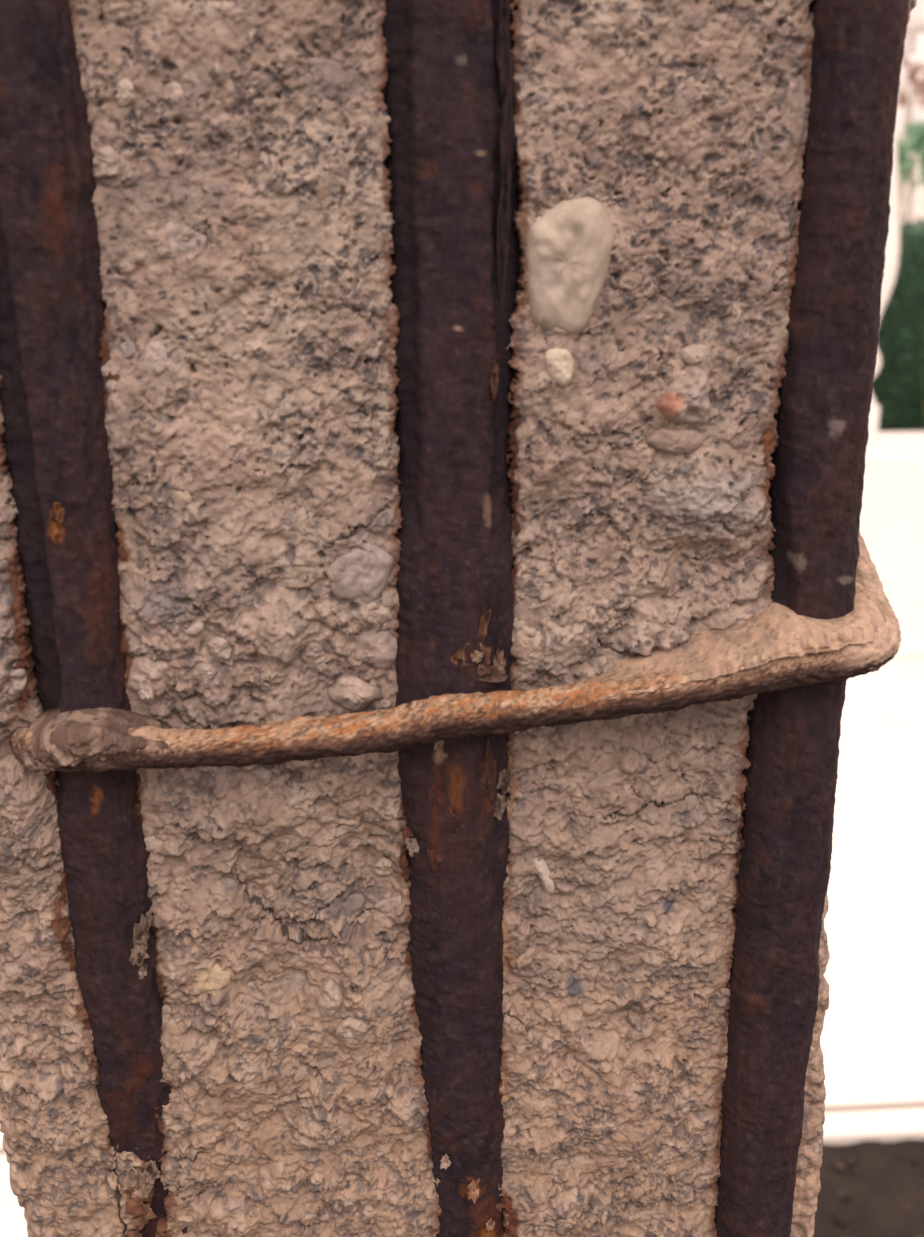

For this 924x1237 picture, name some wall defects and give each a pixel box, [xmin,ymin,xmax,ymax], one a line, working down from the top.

corrosion [505,407,522,536]
corrosion [450,605,517,683]
corrosion [479,738,518,820]
crack [604,773,735,823]
corrosion [398,802,444,882]
corrosion [49,868,76,971]
corrosion [129,910,168,999]
crack [234,867,370,944]
corrosion [502,917,516,984]
corrosion [121,1106,168,1237]
corrosion [423,1122,451,1170]
corrosion [467,1178,480,1204]